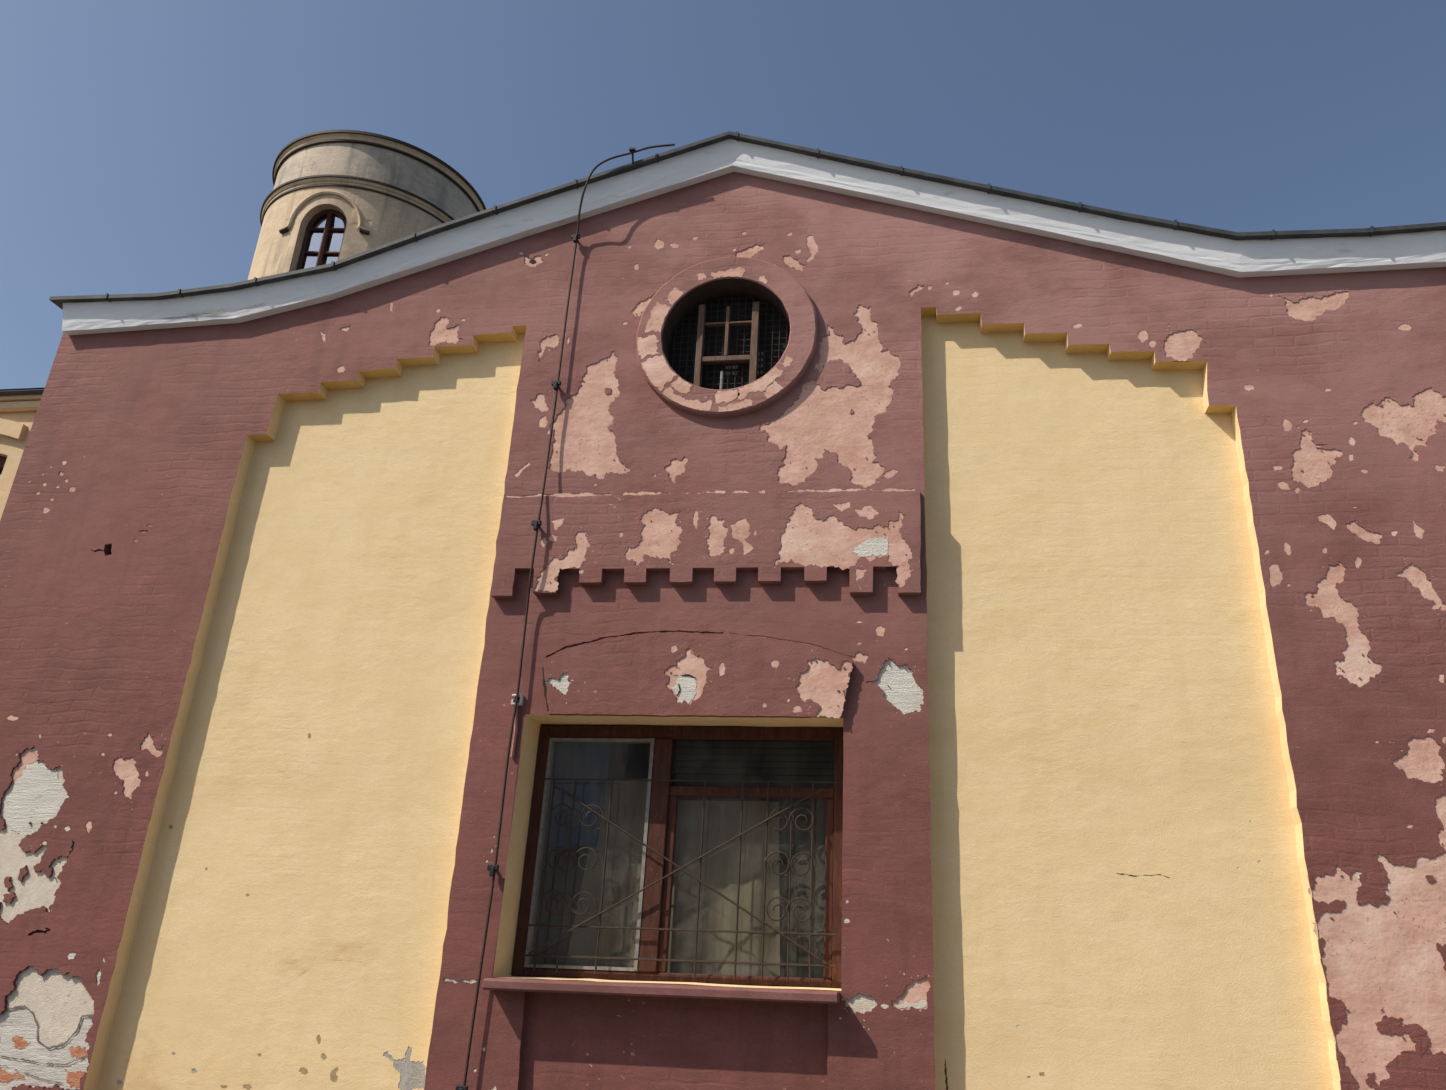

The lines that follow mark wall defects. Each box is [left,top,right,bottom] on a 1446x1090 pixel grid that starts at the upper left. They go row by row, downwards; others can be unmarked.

peeling [519,252,548,267]
peeling [698,232,819,284]
peeling [506,287,915,592]
peeling [1273,388,1446,494]
peeling [1264,506,1424,687]
peeling [1396,557,1446,614]
peeling [664,643,725,706]
peeling [771,621,924,718]
peeling [101,721,165,810]
flaking render [0,734,92,928]
peeling [1308,728,1446,1090]
flaking render [0,952,105,1090]